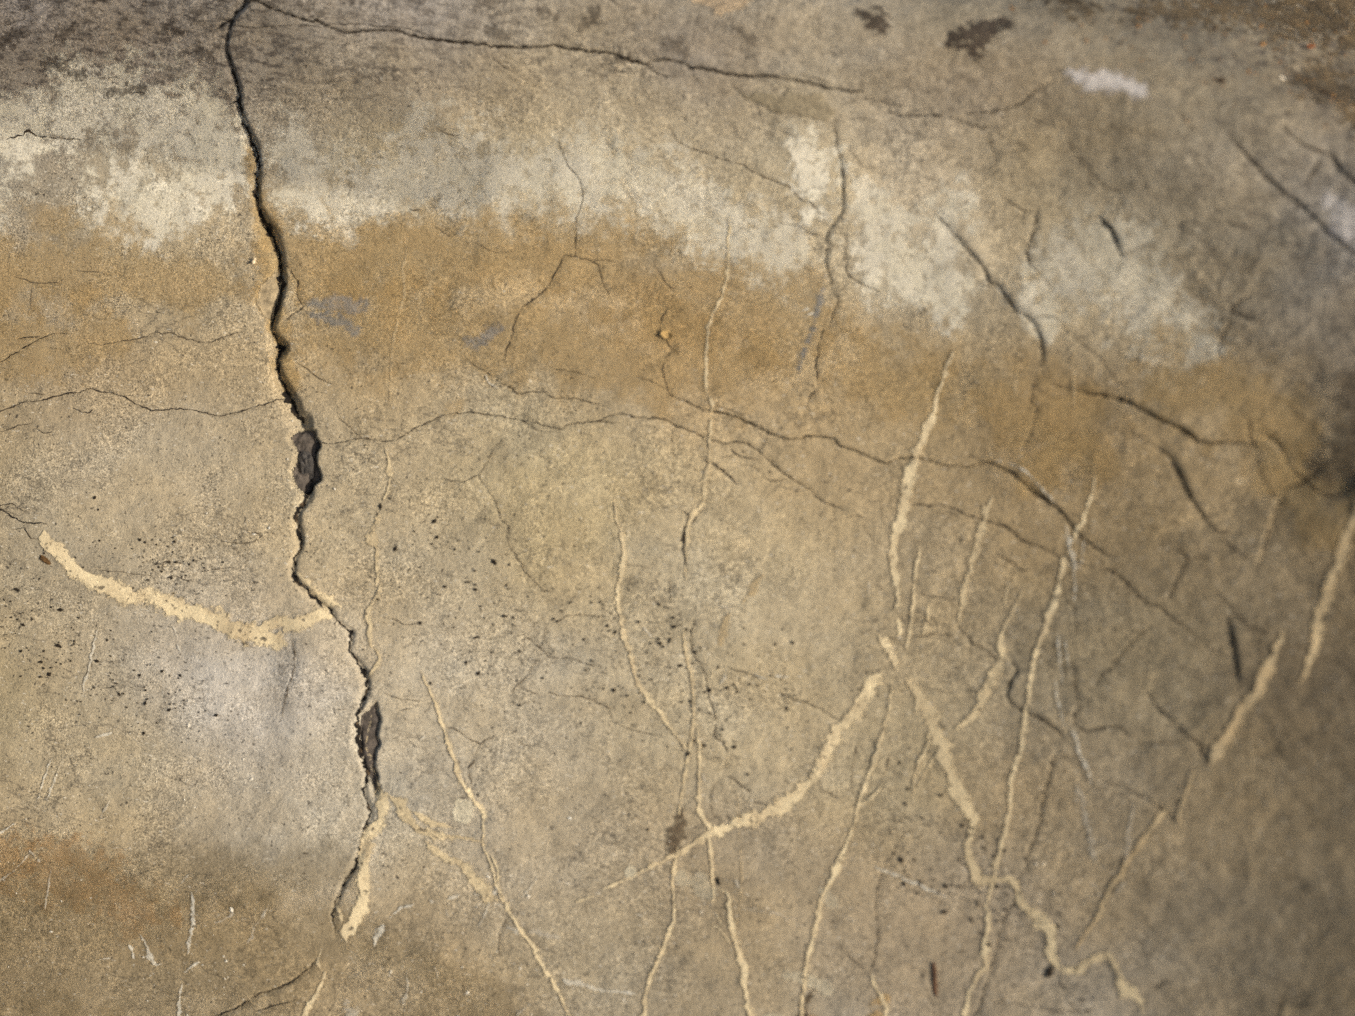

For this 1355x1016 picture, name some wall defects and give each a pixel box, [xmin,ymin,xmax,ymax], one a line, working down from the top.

leakage [1066,68,1147,98]
leakage [0,45,986,335]
crack [0,0,1046,434]
crack [1174,107,1355,254]
leakage [1324,196,1355,240]
leakage [267,293,299,391]
leakage [1015,211,1225,374]
crack [0,503,48,539]
crack [102,142,1355,1016]